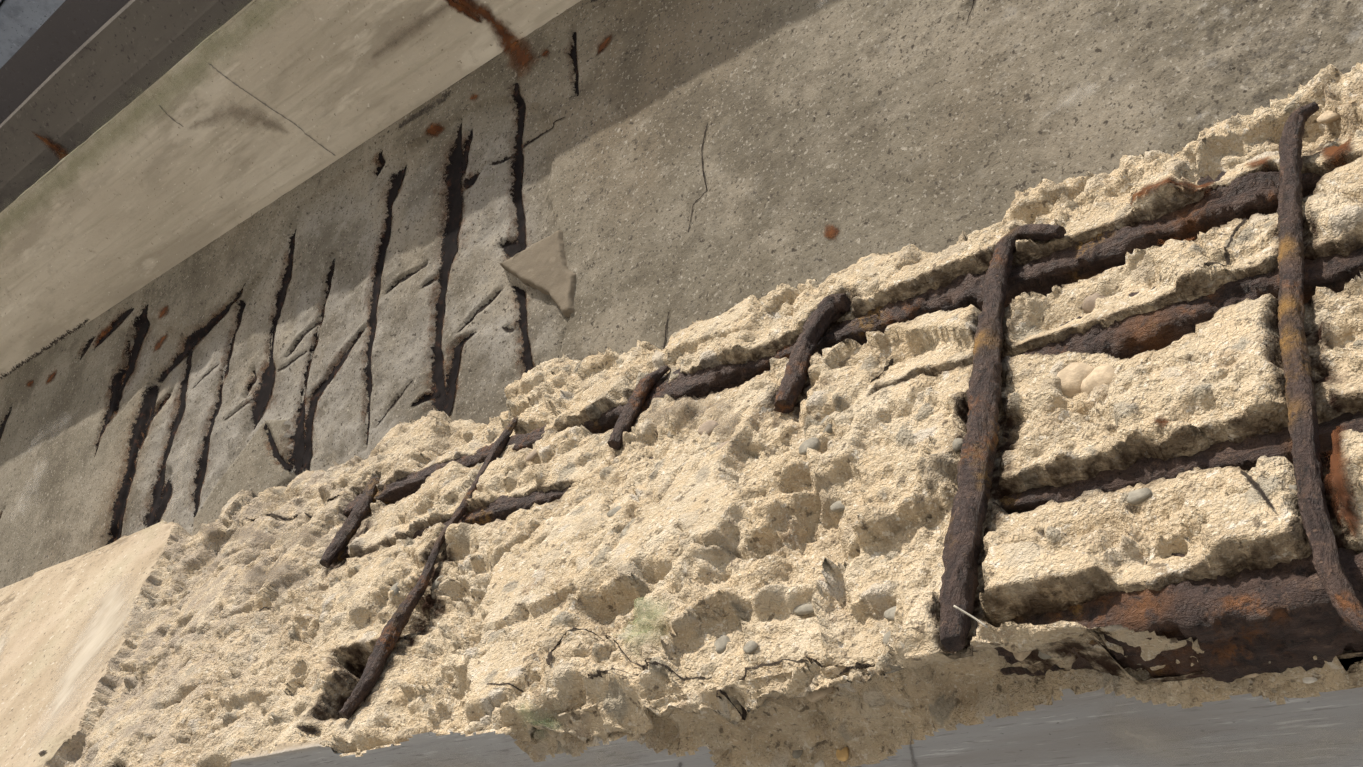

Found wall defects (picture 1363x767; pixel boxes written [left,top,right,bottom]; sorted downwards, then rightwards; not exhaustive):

rust [446,0,549,75]
rust [824,226,838,238]
rust [1131,177,1214,205]
crack [79,32,579,546]
spalling [105,94,577,538]
crack [0,407,12,440]
spalling [1057,362,1094,397]
spalling [1303,246,1363,607]
rust [1323,427,1358,535]
spalling [1000,553,1363,683]
crack [487,683,524,692]
crack [546,627,875,720]